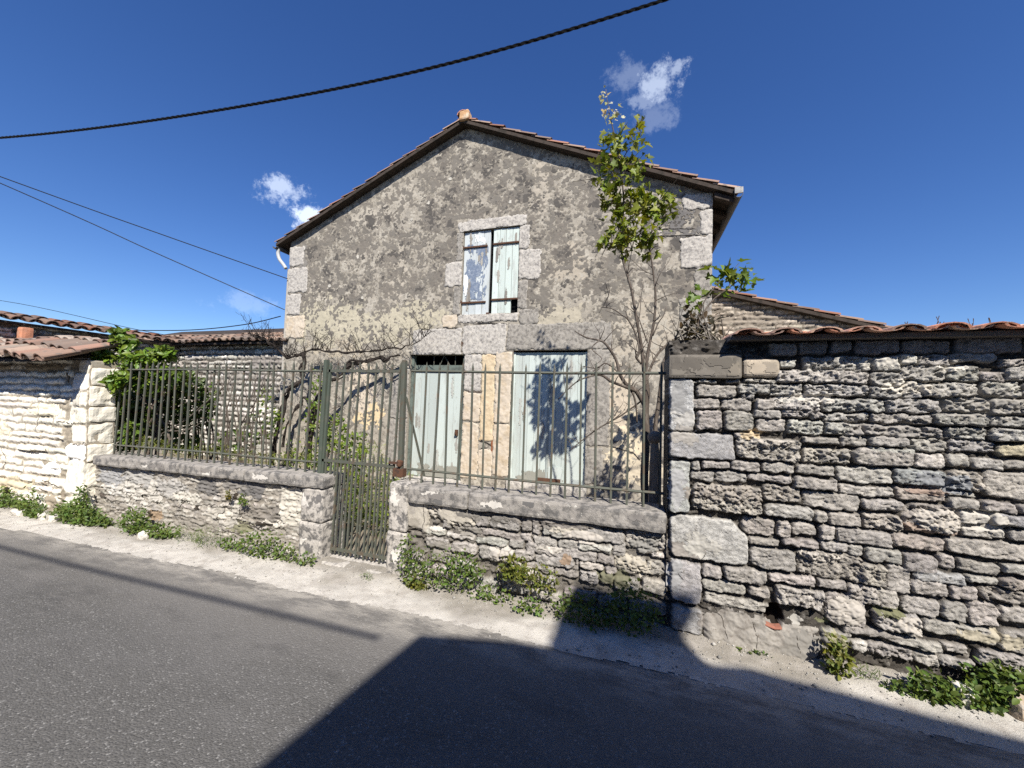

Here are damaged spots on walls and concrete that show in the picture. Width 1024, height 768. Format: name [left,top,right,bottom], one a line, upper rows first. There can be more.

peeling [537,302,583,325]
spalling [763,602,803,625]